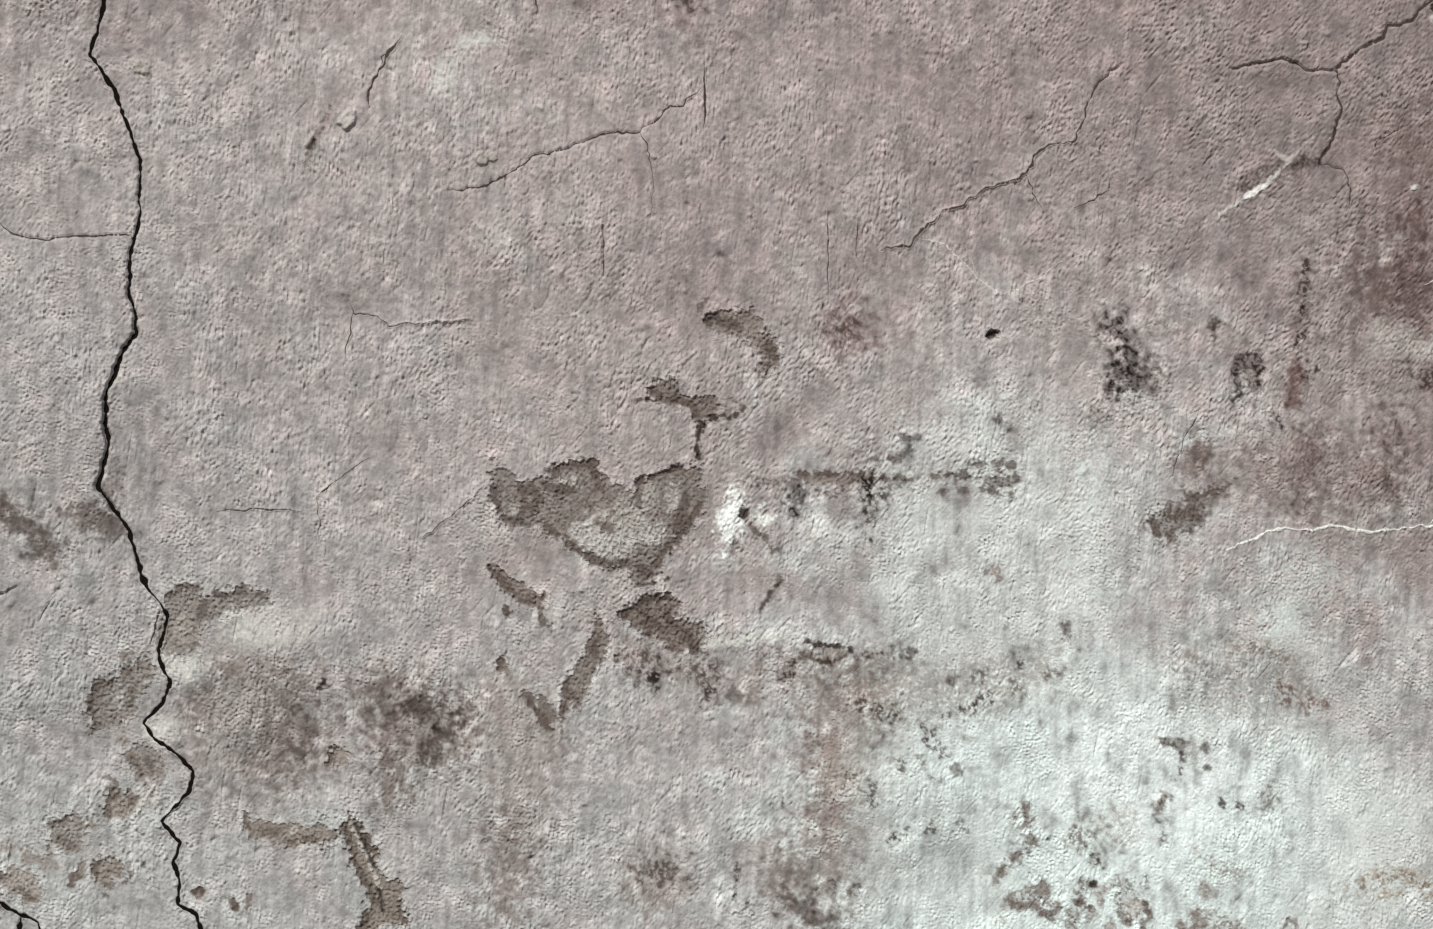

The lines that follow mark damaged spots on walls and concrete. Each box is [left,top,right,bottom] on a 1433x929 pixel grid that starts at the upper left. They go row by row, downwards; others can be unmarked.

crack [0,0,203,929]
crack [1233,0,1433,211]